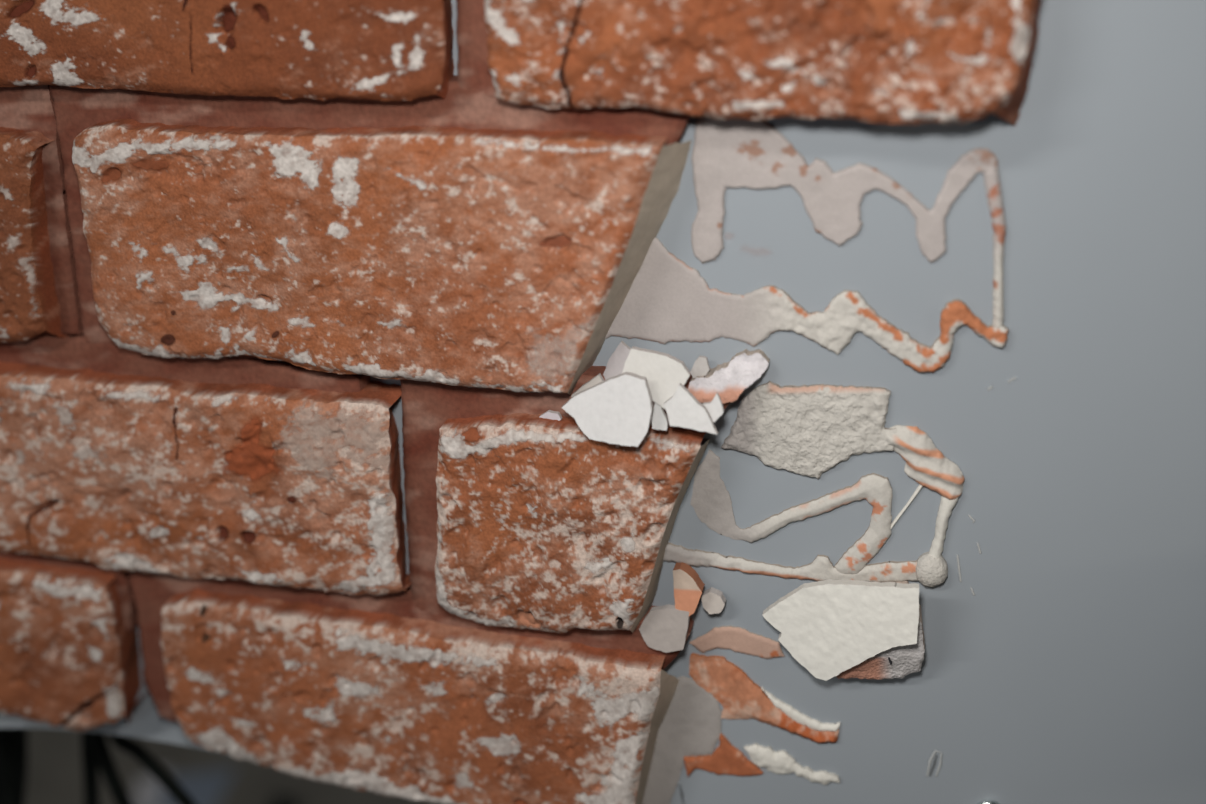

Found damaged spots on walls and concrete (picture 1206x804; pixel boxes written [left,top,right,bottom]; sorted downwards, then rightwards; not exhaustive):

crack [559,2,583,108]
peeling [899,109,961,122]
spalling [762,579,925,681]